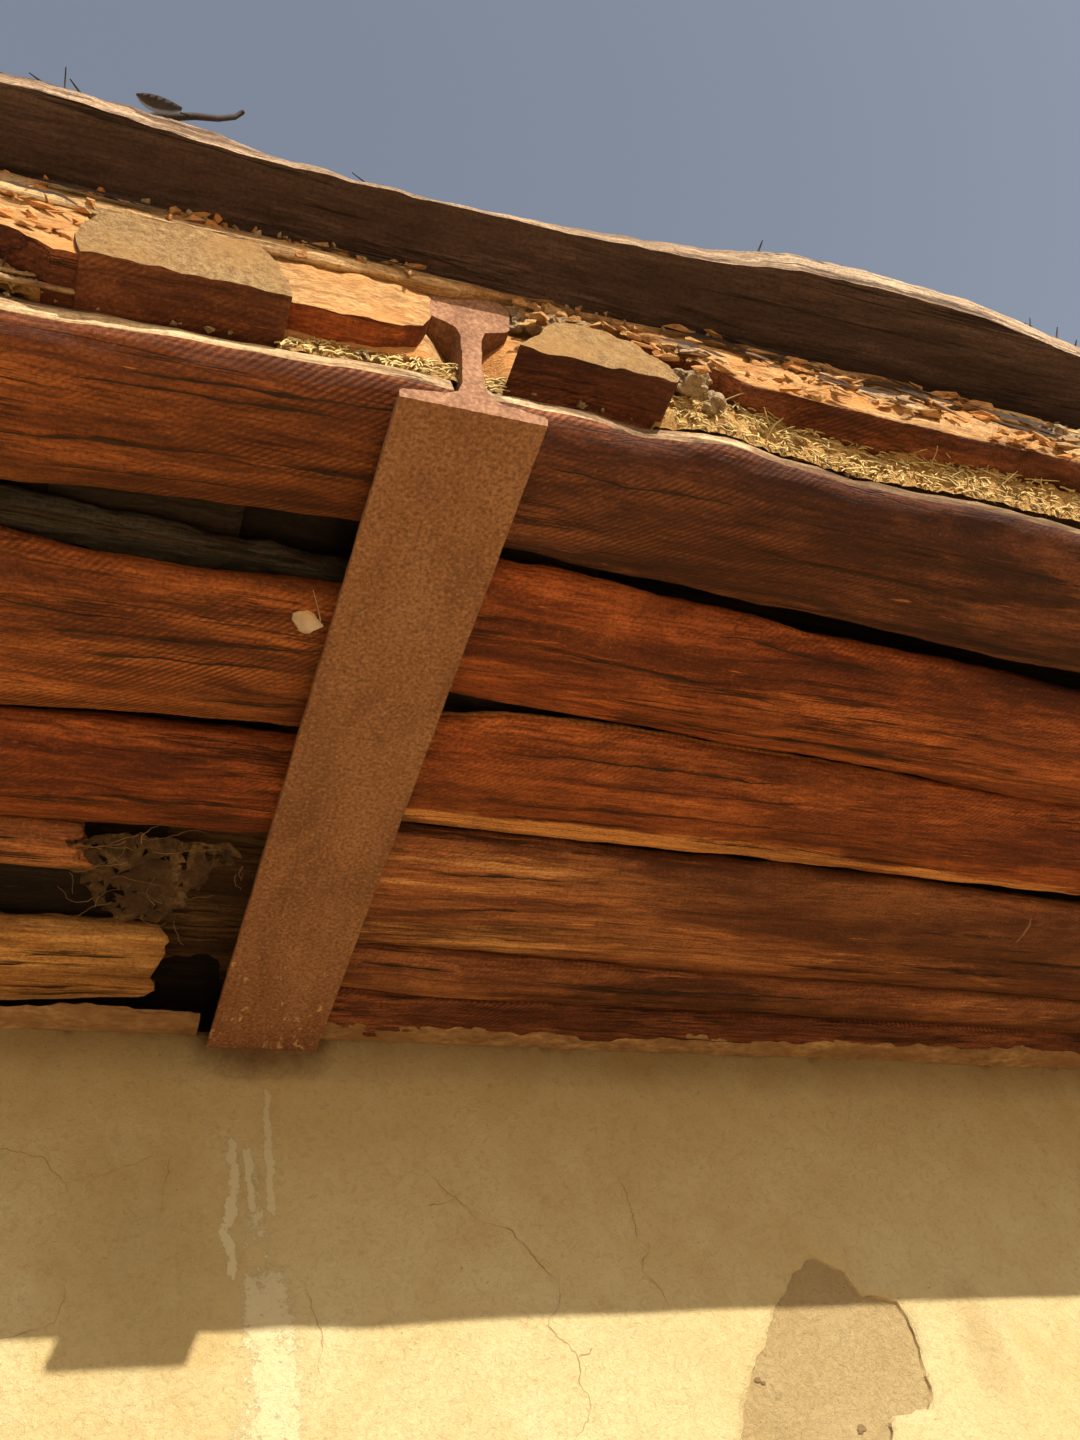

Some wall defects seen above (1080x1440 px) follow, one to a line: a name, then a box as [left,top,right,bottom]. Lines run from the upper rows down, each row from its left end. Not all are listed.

leakage [218,1088,311,1440]
crack [415,1159,592,1437]
flaking render [741,1259,930,1440]